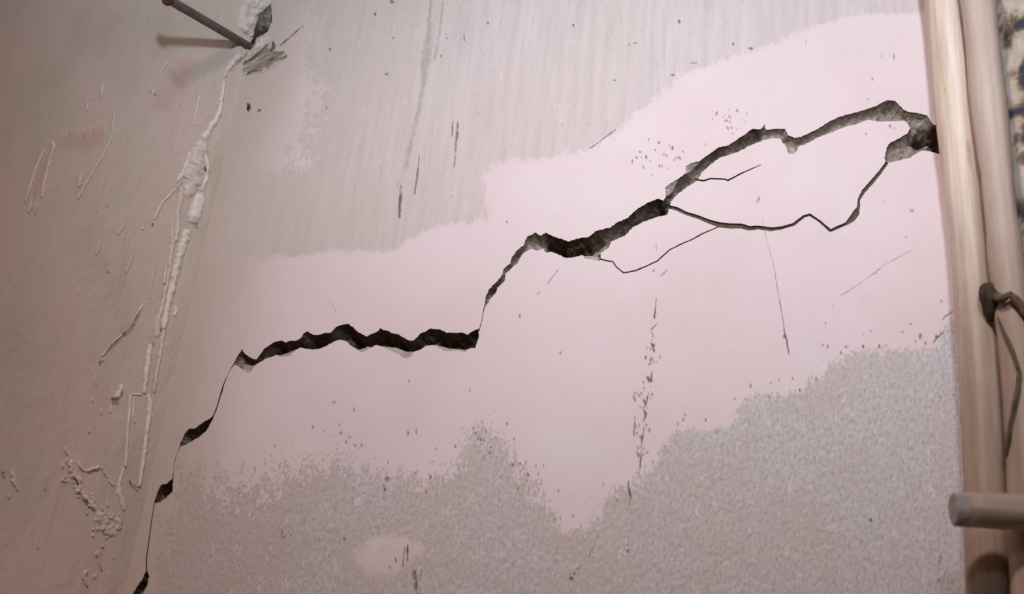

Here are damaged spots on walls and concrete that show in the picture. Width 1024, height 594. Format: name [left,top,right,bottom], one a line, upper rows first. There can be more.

peeling [176,0,926,279]
crack [129,100,940,594]
peeling [139,313,965,594]